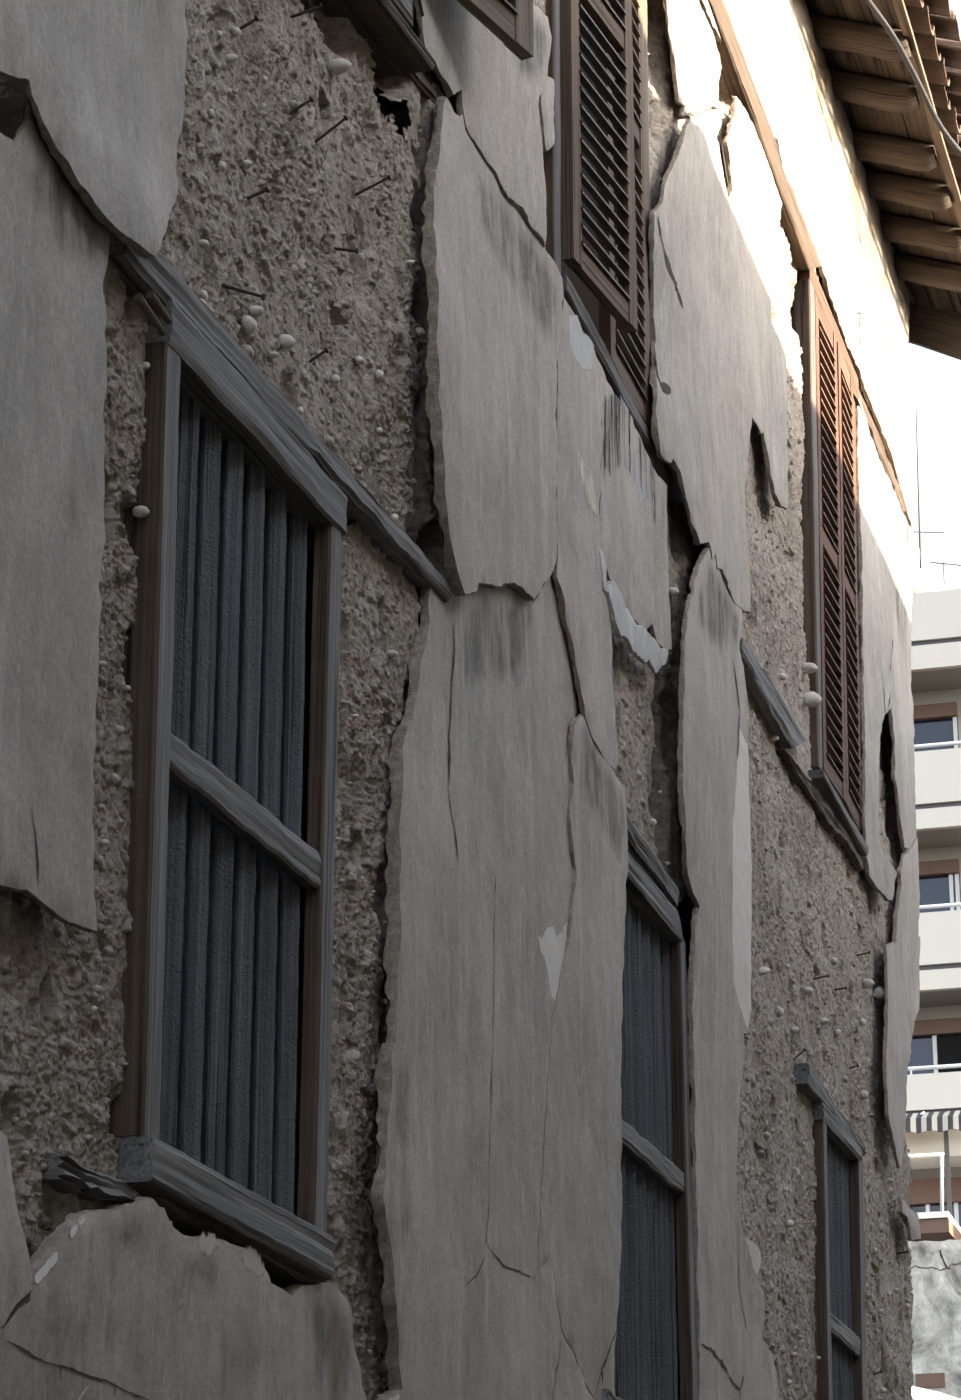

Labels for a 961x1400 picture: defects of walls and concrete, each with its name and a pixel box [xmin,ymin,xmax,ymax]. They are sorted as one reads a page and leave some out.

spalling [0,0,555,1400]
crack [448,628,458,857]
spalling [537,0,921,1400]
crack [4,1338,149,1400]
crack [596,1331,617,1390]